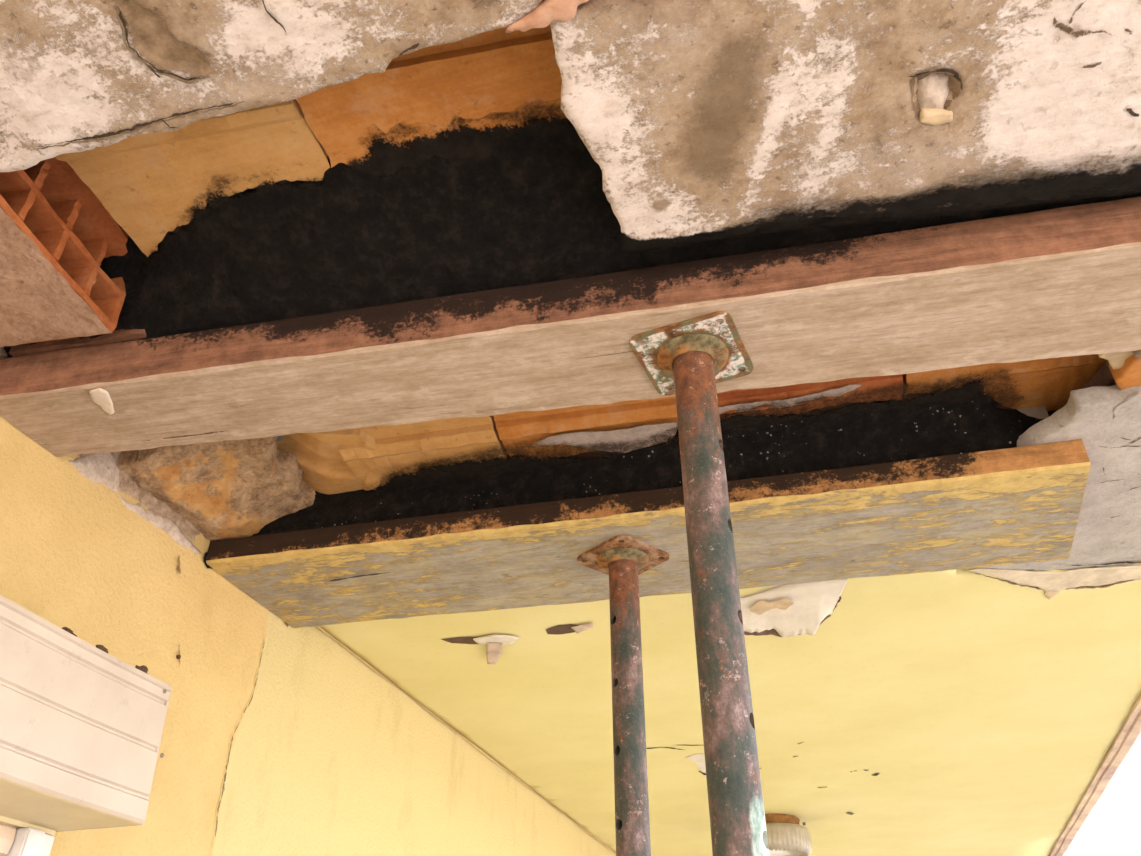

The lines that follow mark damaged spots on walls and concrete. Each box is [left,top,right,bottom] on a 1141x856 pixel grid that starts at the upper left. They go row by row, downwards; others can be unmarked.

crack [1053,1,1132,38]
crack [33,5,245,150]
damp [688,42,757,177]
flaking render [906,69,963,126]
crack [1126,108,1139,117]
spalling [269,429,392,494]
crack [1093,437,1141,490]
peeling [441,634,519,664]
peeling [546,623,593,635]
peeling [740,579,848,638]
peeling [967,561,1141,599]
crack [210,625,266,856]